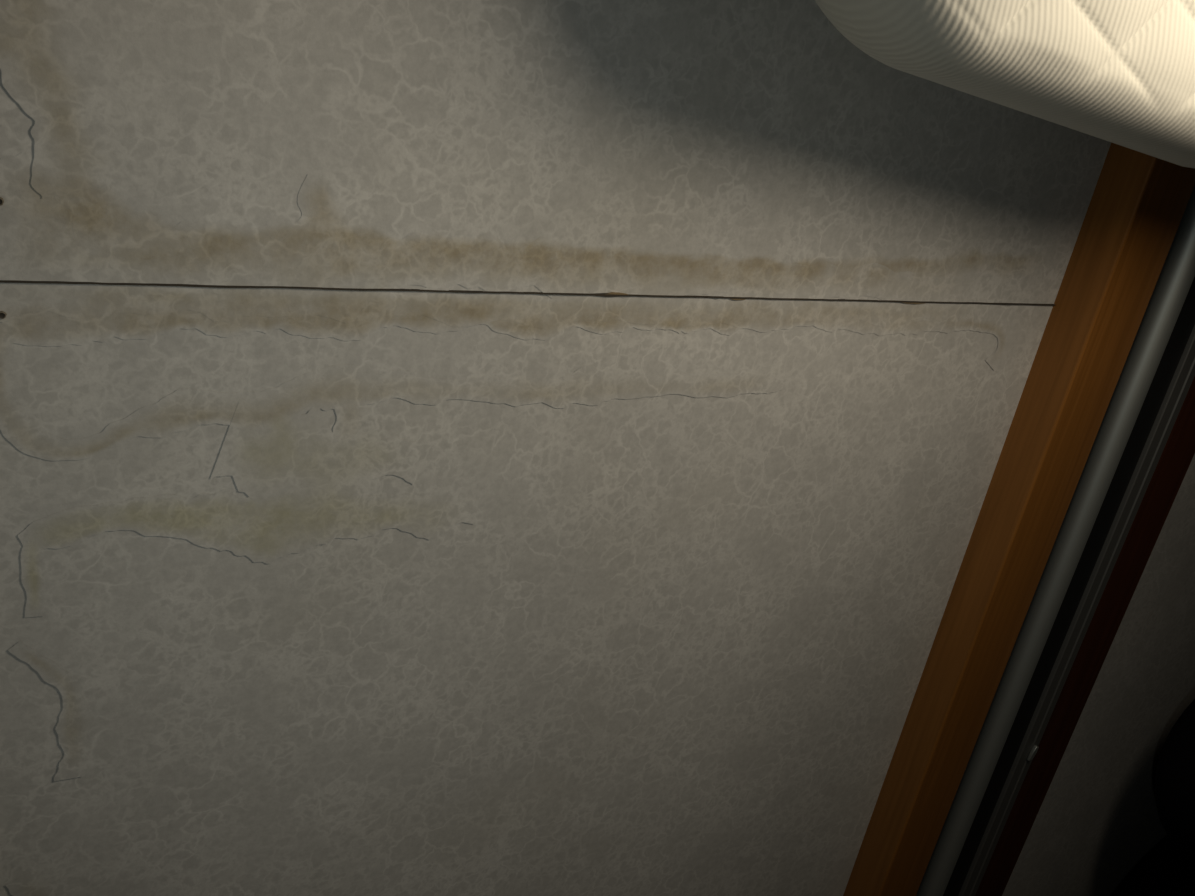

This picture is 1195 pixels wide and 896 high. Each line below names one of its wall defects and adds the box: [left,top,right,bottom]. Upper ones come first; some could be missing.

leakage [0,0,1056,617]